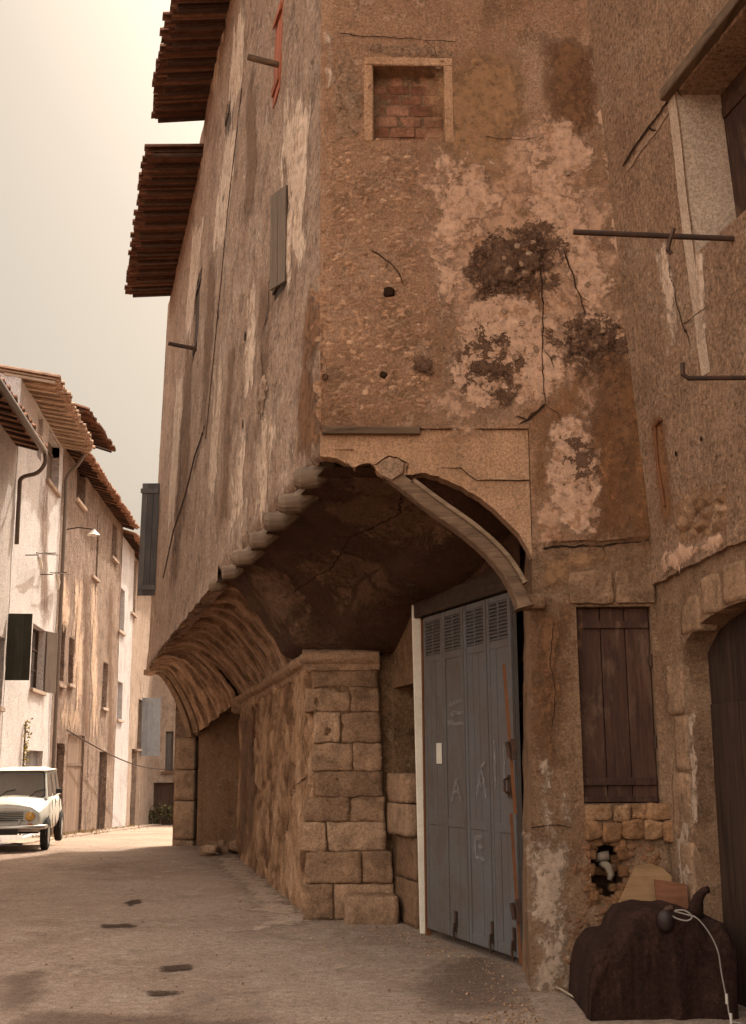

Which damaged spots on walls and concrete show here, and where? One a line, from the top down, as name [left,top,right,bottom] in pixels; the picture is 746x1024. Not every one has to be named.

flaking render [410,62,629,550]
crack [516,268,562,425]
crack [565,254,589,313]
flaking render [317,455,456,545]
spalling [562,838,662,964]